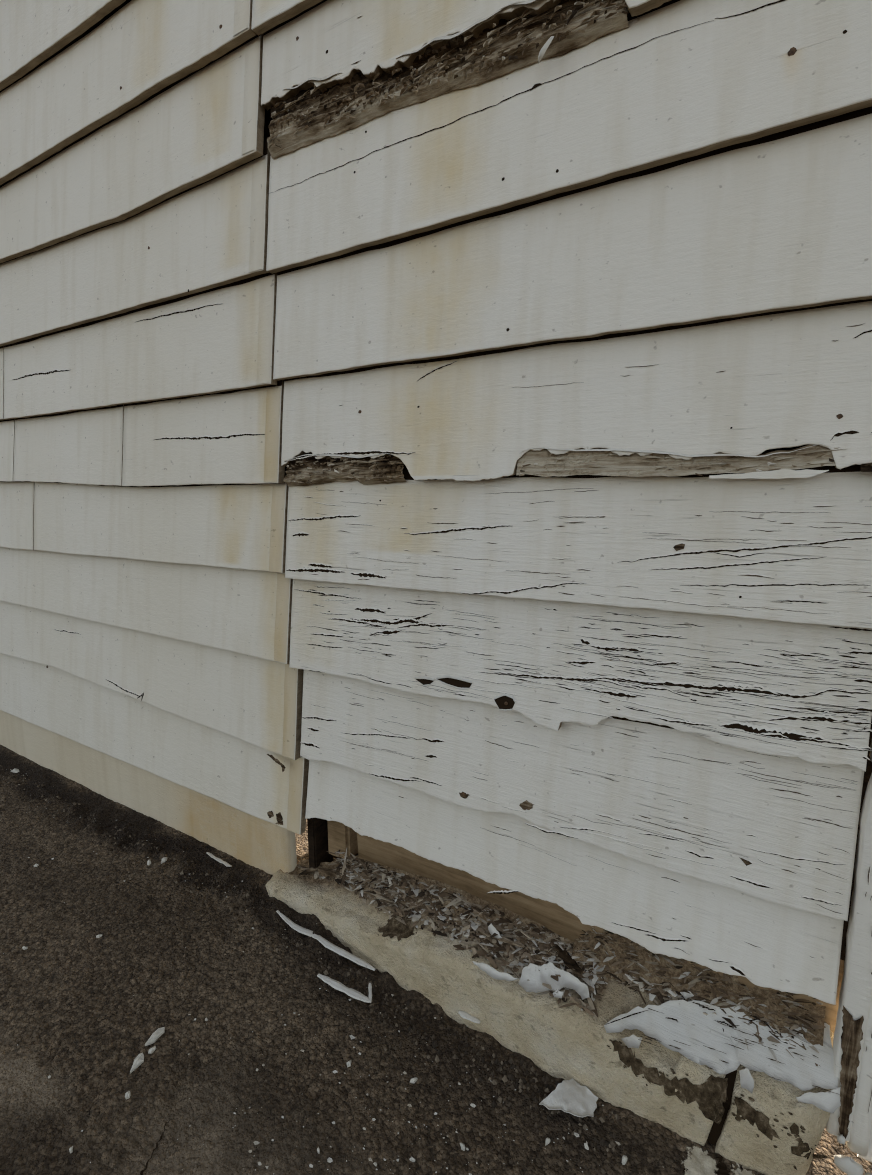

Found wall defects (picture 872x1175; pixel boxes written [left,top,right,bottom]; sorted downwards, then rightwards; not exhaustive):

peeling [538,36,554,63]
crack [268,0,785,194]
peeling [709,469,829,479]
crack [404,525,512,535]
crack [286,514,450,637]
crack [494,536,872,761]
crack [300,716,444,786]
spalling [378,911,417,941]
peeling [473,961,518,981]
peeling [539,1078,598,1117]
crack [707,1070,737,1175]
peeling [604,991,872,1175]